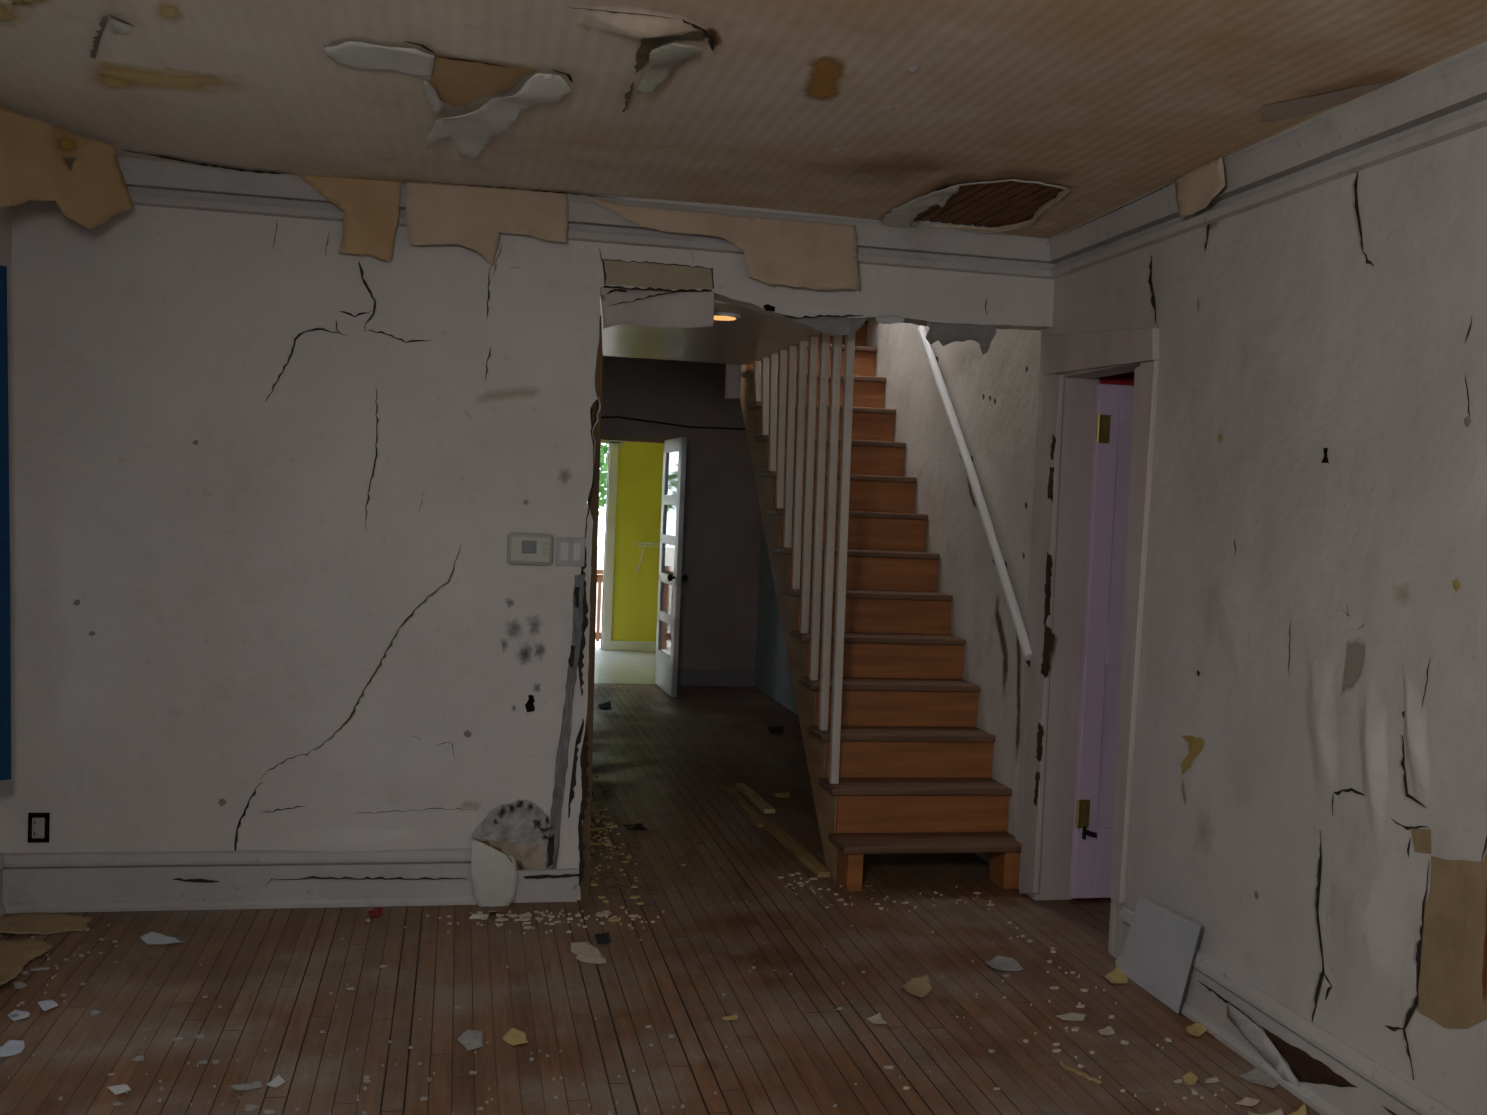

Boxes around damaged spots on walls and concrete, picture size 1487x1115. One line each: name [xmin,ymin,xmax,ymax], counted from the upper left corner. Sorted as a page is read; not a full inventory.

peeling [569,5,720,112]
peeling [879,185,960,228]
crack [1352,171,1374,267]
crack [266,235,431,401]
crack [365,389,380,531]
crack [173,546,482,883]
flaking render [469,799,552,919]
crack [1311,735,1429,1022]
flaking render [1411,828,1487,1029]
crack [1384,925,1421,1080]
peeling [1235,1067,1280,1106]